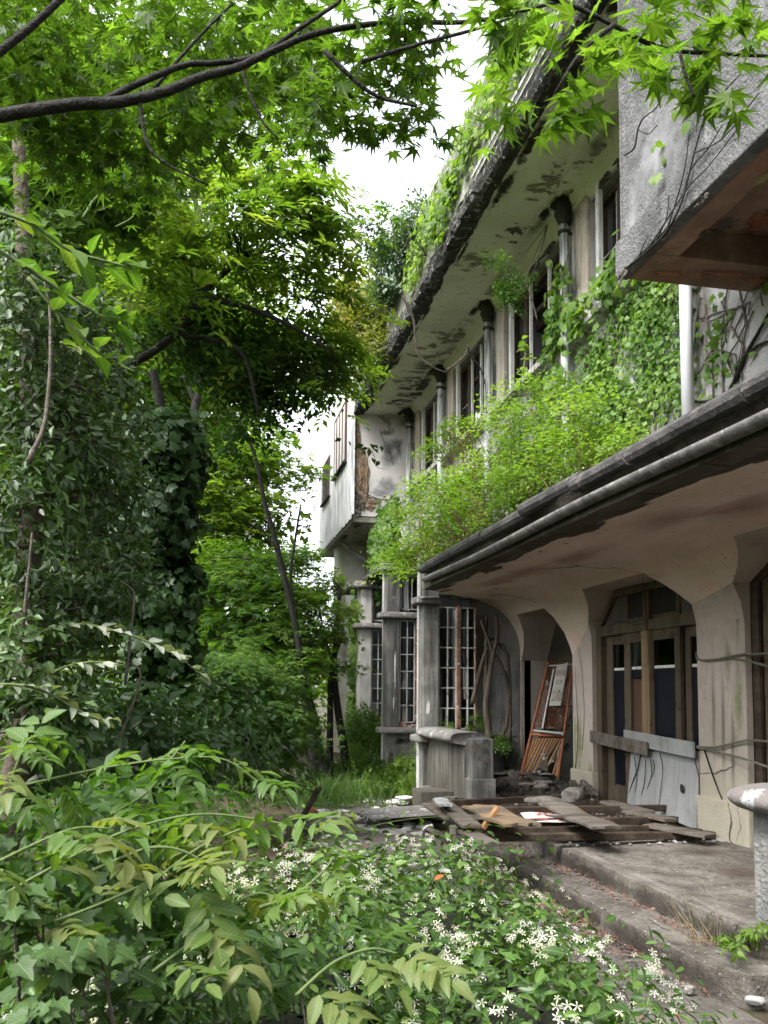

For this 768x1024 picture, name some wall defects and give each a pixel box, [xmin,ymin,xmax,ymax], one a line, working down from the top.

water stain [606,1,617,15]
water stain [558,57,587,93]
water stain [491,120,547,208]
water stain [534,193,566,229]
water stain [382,431,401,462]
spalling [350,419,380,516]
water stain [659,450,768,497]
water stain [562,503,648,538]